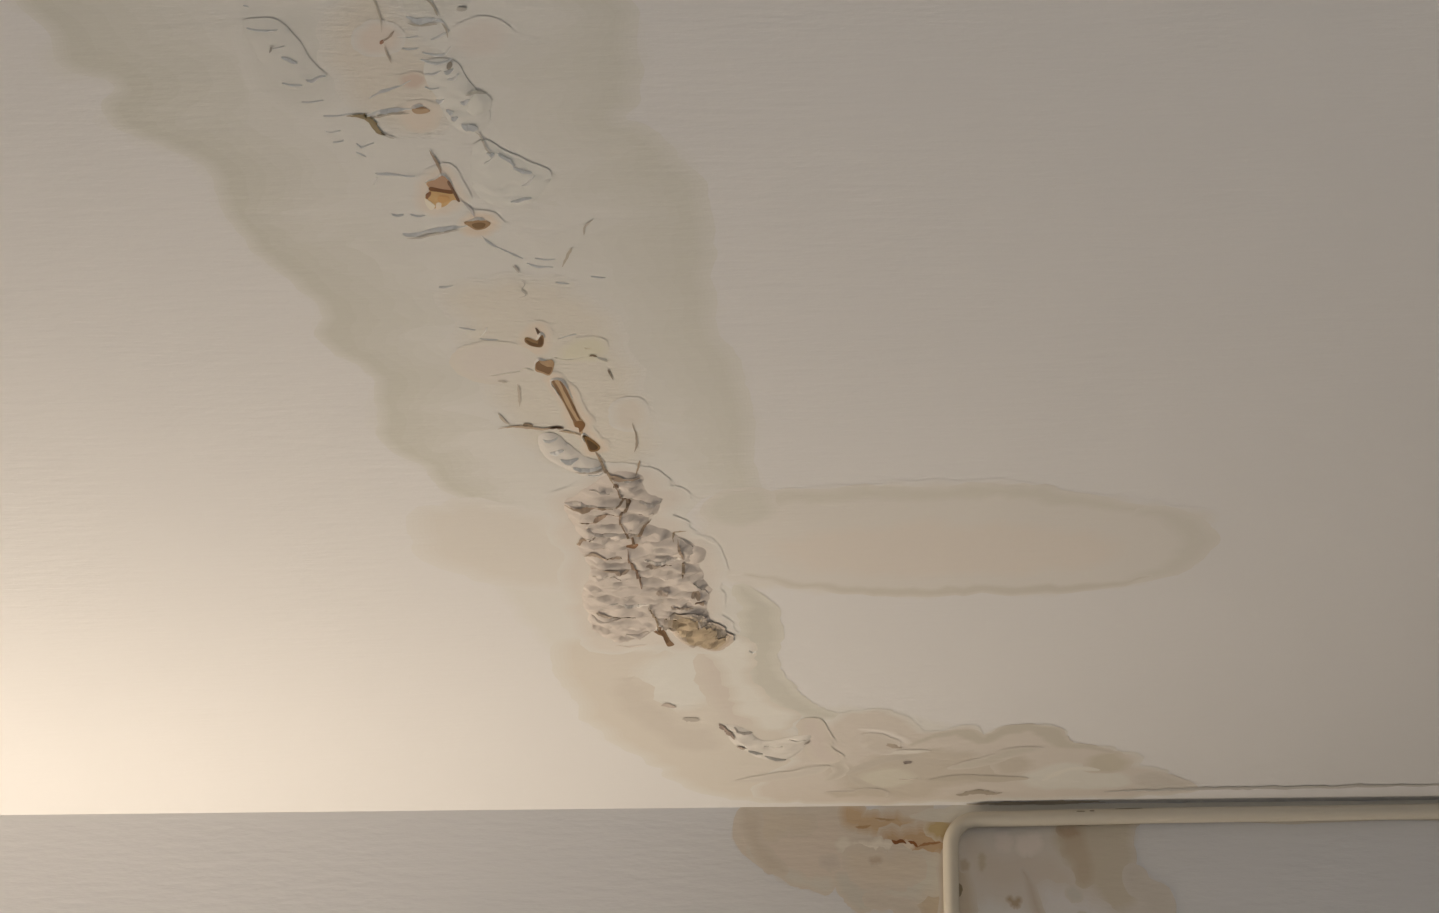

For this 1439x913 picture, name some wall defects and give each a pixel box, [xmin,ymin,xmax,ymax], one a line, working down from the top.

crack [349,113,410,139]
peeling [282,16,478,157]
crack [373,0,467,62]
crack [429,150,441,174]
spalling [375,173,569,284]
crack [562,220,593,267]
water stain [0,0,1221,790]
peeling [490,328,713,647]
crack [498,380,705,630]
water stain [406,488,1439,823]
water stain [731,806,940,913]
water stain [959,824,1176,913]